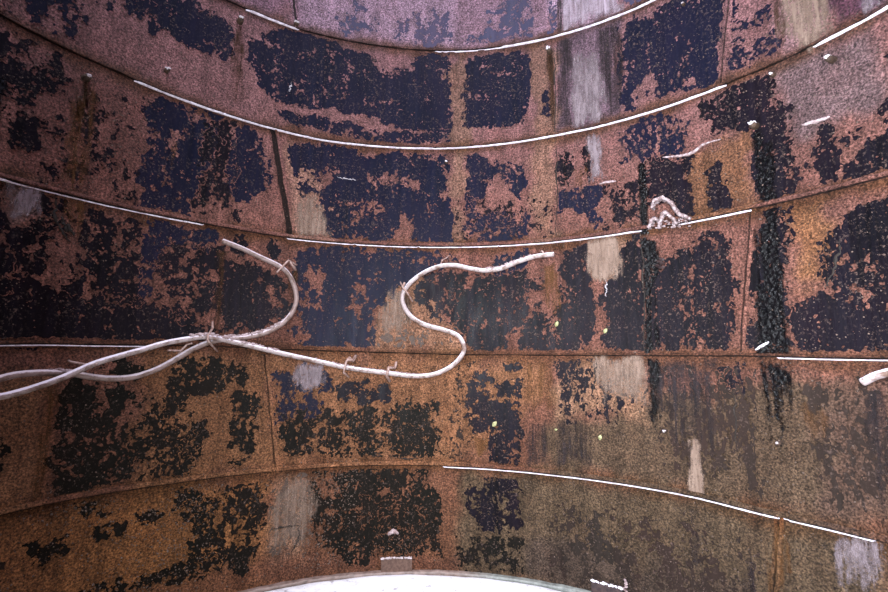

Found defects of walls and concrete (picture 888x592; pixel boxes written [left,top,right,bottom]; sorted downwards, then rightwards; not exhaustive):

peeling [0,0,888,429]
rust [546,55,555,126]
damp [556,0,623,127]
damp [587,135,602,177]
rust [662,139,721,158]
damp [780,0,833,51]
rust [189,319,283,351]
rust [375,296,453,350]
peeling [41,354,272,592]
peeling [269,360,526,576]
peeling [649,359,766,503]
peeling [798,373,888,517]